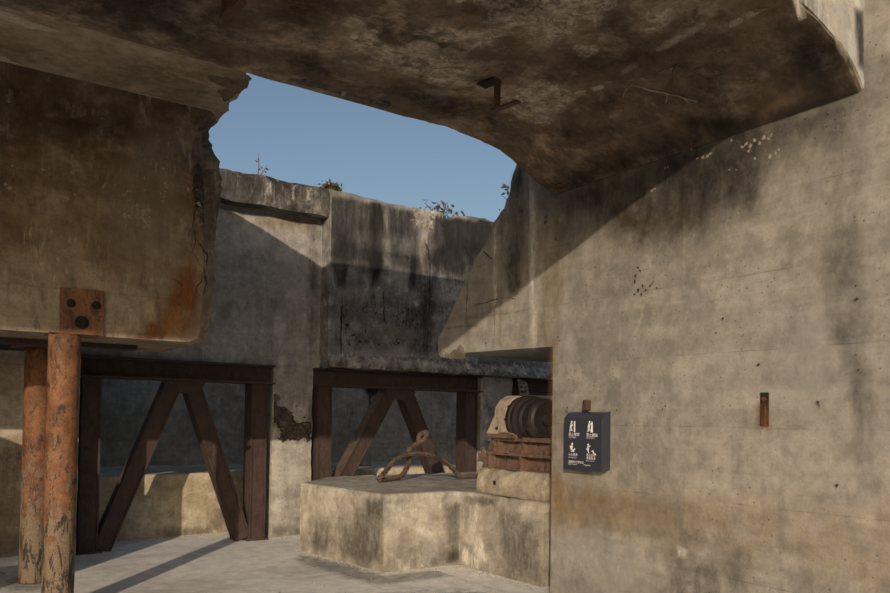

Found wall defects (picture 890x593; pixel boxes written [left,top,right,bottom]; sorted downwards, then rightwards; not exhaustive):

leakage [676,149,743,207]
crack [172,209,208,297]
leakage [332,203,496,296]
spalling [273,394,312,443]